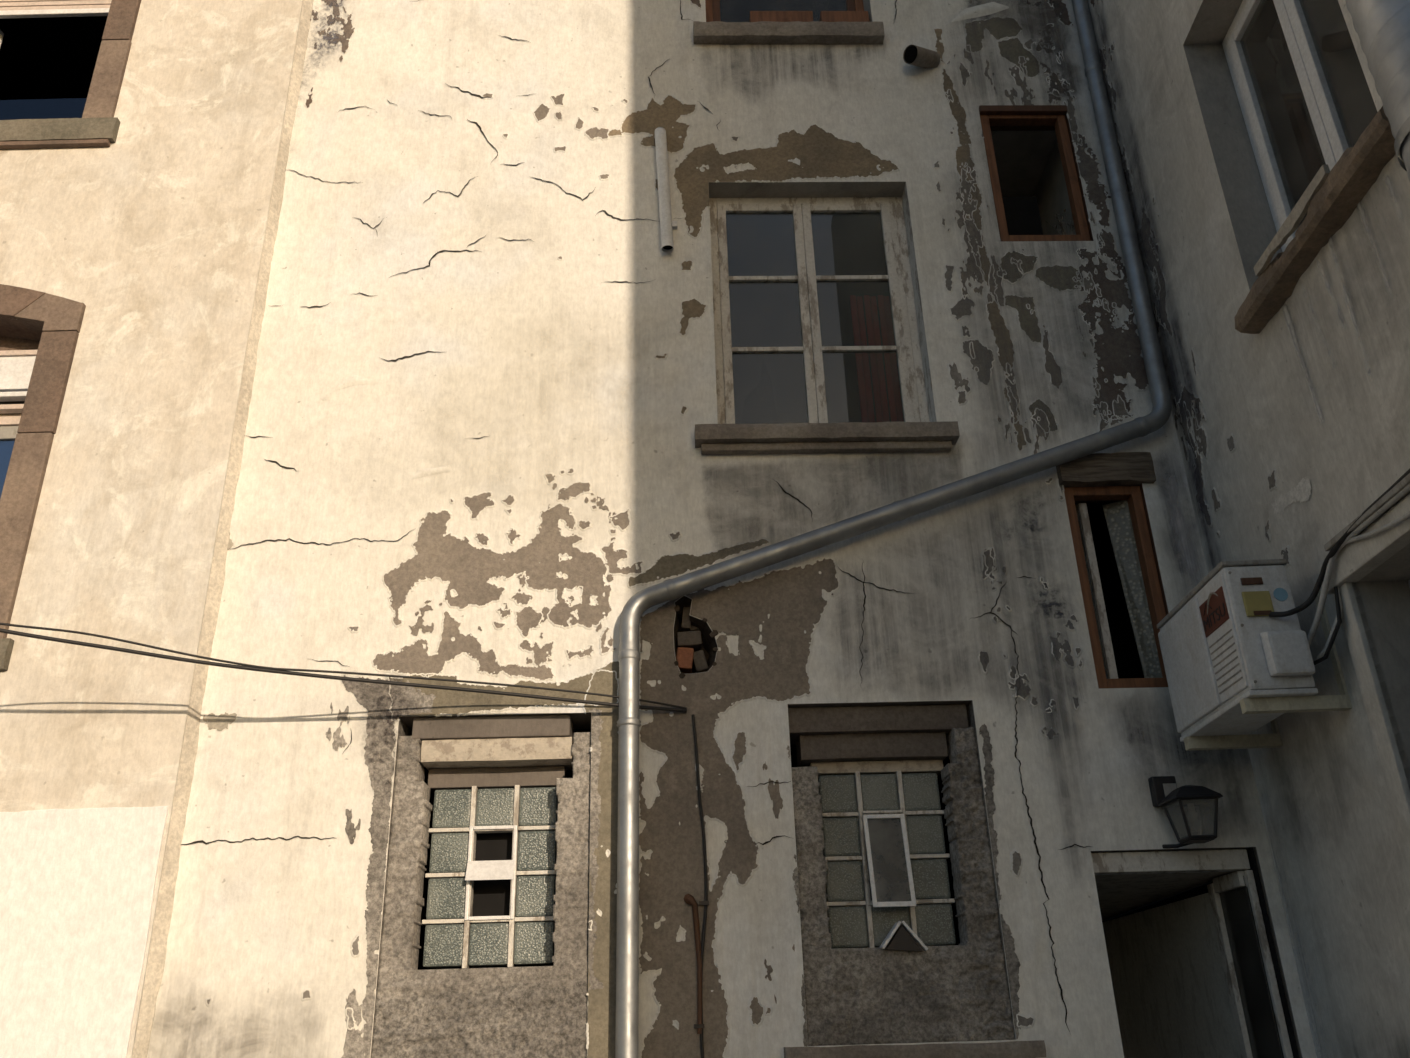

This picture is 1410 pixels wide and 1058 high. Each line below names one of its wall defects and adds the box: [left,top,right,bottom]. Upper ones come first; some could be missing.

peeling [310,0,355,62]
crack [275,235,534,308]
crack [339,85,681,221]
peeling [532,93,900,239]
peeling [932,0,1149,455]
crack [381,351,441,361]
crack [233,530,412,549]
flaking render [203,712,237,731]
crack [181,836,334,845]
peeling [326,467,772,1058]
peeling [639,557,840,1058]
crack [970,576,1092,1032]